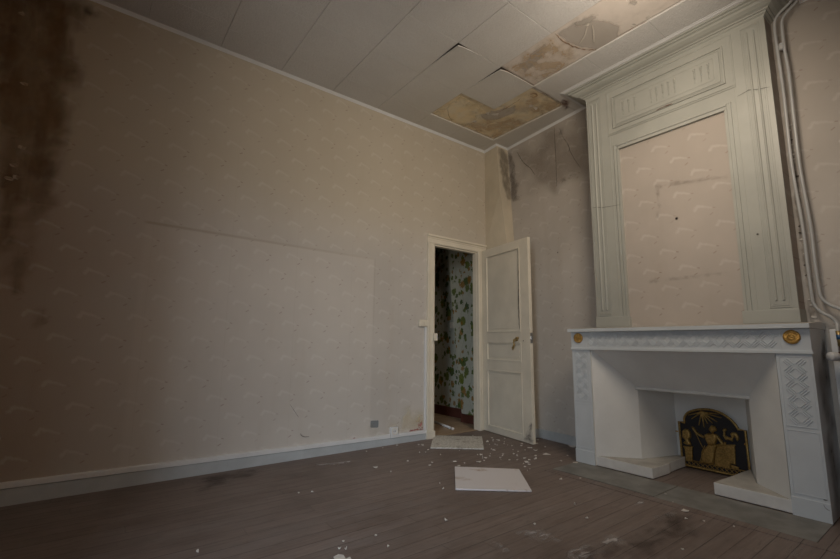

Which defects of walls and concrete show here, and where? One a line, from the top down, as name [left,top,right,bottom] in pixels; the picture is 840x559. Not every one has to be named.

peeling [432,0,680,139]